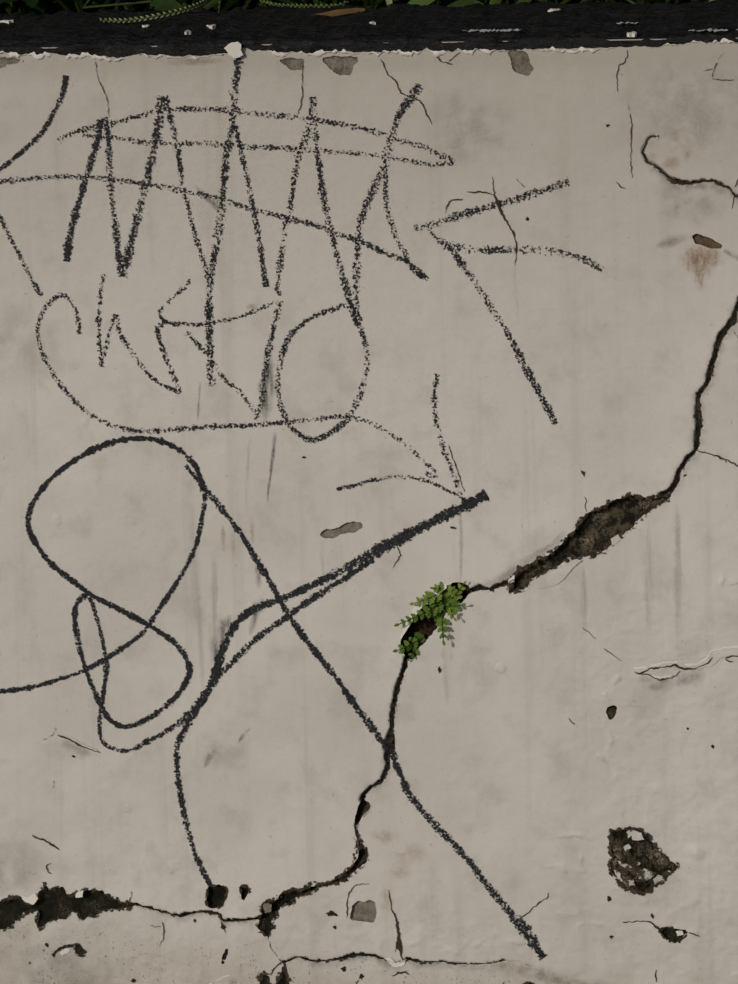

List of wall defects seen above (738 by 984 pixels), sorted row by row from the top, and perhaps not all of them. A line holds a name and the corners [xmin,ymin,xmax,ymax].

crack [616,50,738,207]
crack [660,302,738,498]
flaking render [320,521,363,539]
crack [471,579,515,592]
crack [354,656,408,840]
crack [32,835,59,891]
flaking render [607,826,680,896]
flaking render [0,882,134,932]
crack [127,890,505,984]
crack [623,913,660,931]